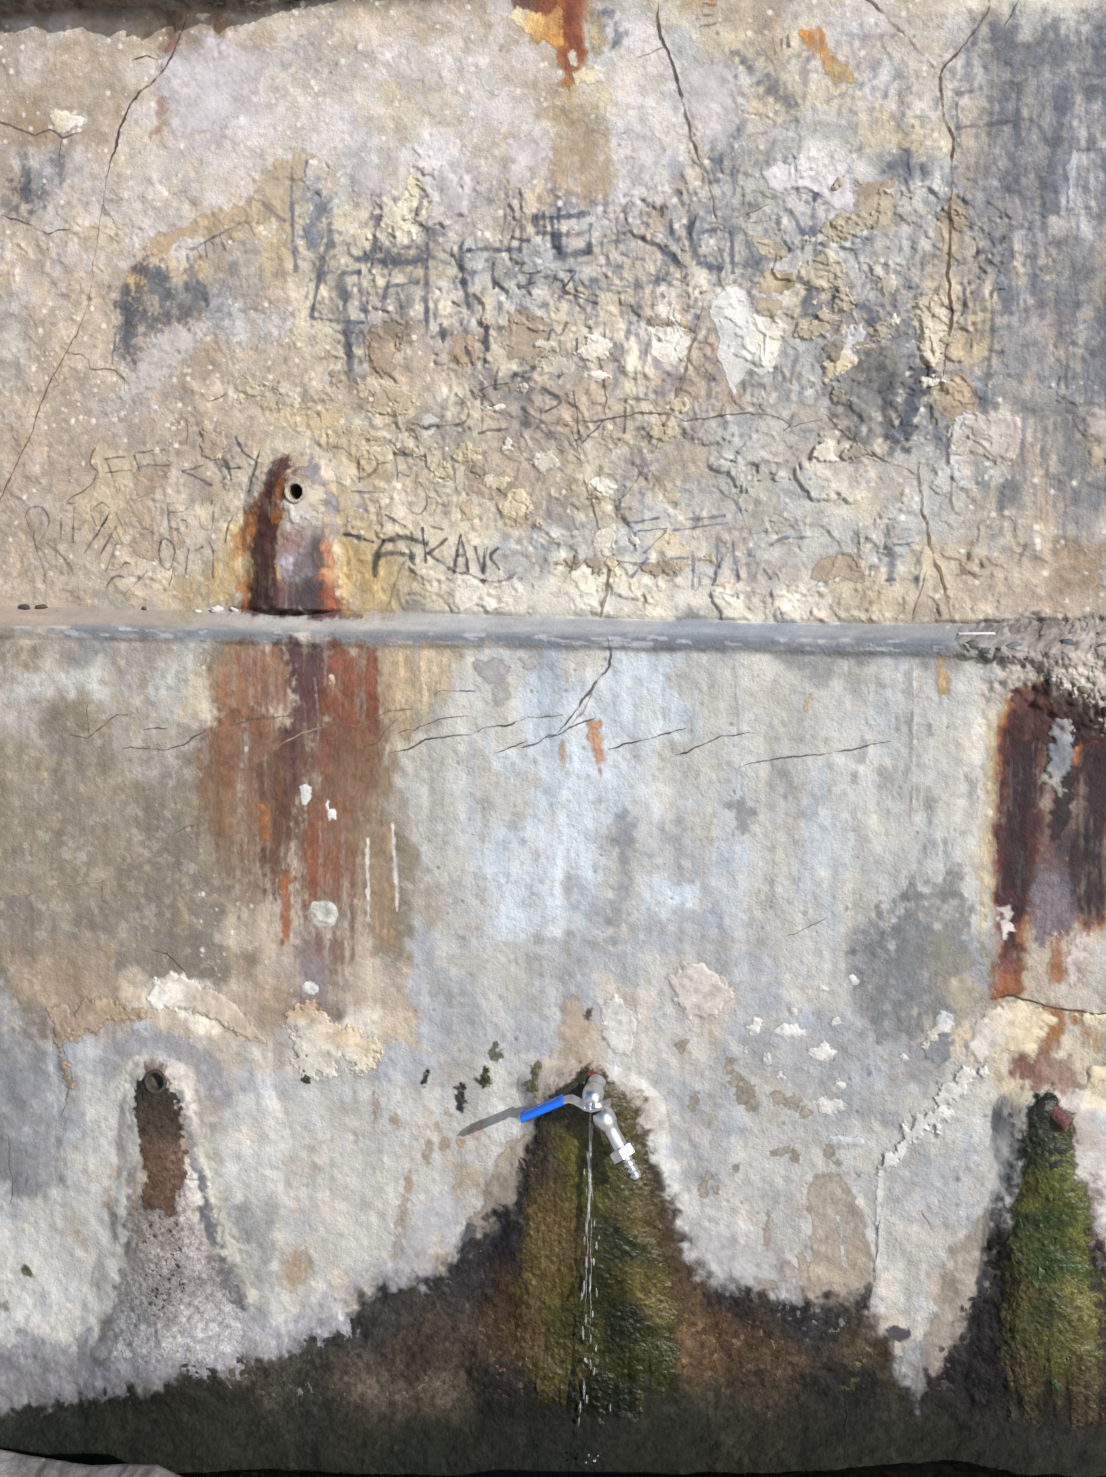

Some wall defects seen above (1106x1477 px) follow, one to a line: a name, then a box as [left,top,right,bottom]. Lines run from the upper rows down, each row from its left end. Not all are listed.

corrosion [508,0,606,88]
crack [0,15,187,502]
peeling [709,161,1023,465]
crack [868,0,1019,395]
corrosion [174,455,413,620]
corrosion [196,636,459,1008]
crack [74,569,890,768]
spalling [956,611,1106,735]
corrosion [979,677,1106,1002]
peeling [46,970,267,1089]
peeling [281,981,384,1085]
damp [0,1033,1106,1477]